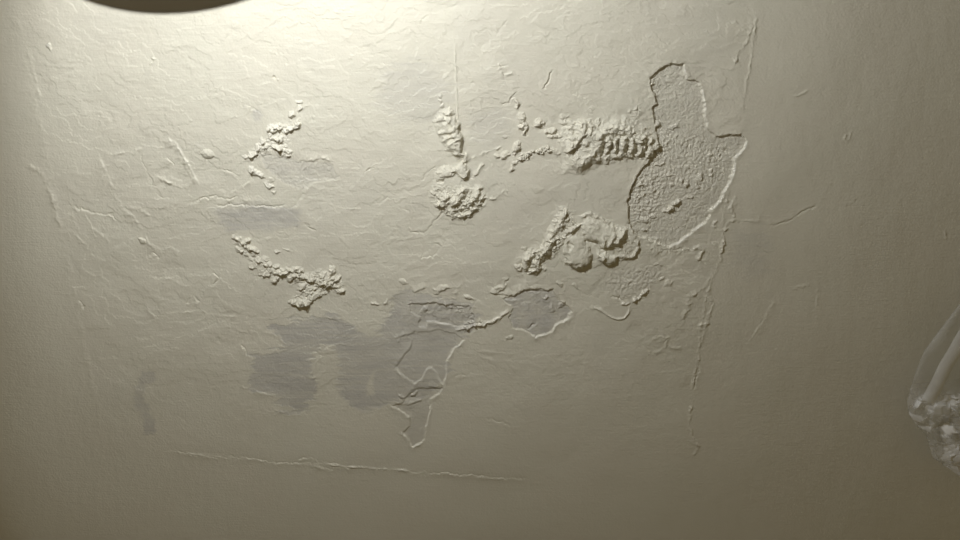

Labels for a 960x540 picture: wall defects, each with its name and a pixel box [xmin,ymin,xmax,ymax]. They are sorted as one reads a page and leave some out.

peeling [591,61,750,321]
water stain [246,280,439,419]
peeling [388,274,579,451]